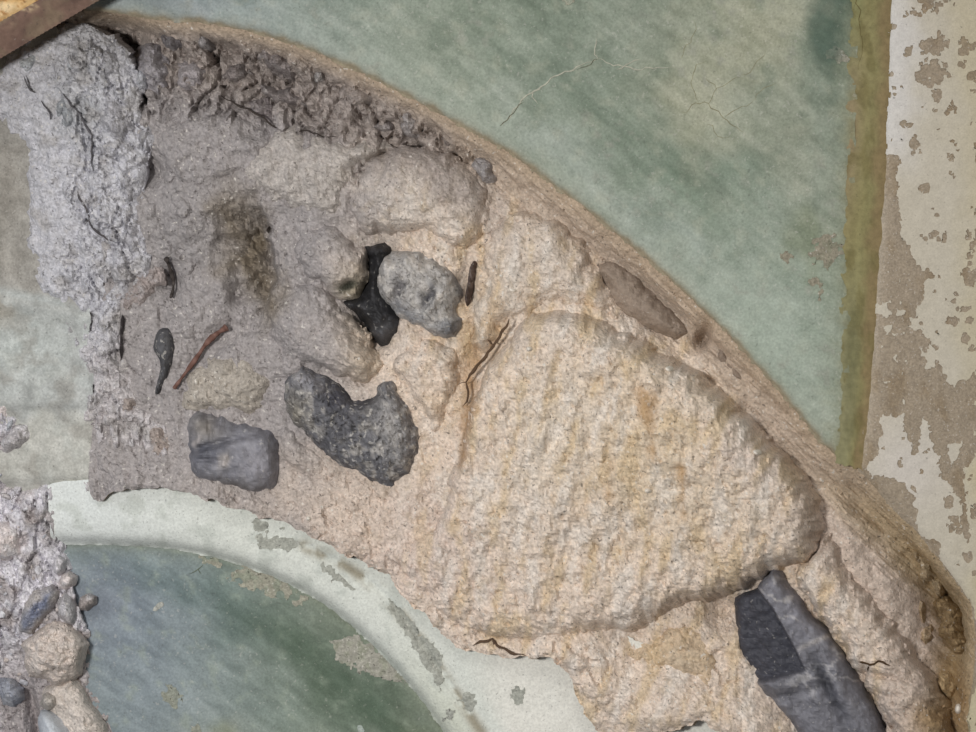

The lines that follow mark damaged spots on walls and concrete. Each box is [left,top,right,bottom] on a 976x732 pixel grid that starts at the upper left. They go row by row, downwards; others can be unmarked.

spalling [257,50,296,83]
spalling [259,84,300,106]
peeling [875,0,976,388]
spalling [0,23,170,457]
spalling [599,261,688,340]
crack [458,319,509,406]
peeling [251,518,303,552]
peeling [867,413,976,619]
peeling [329,634,406,684]
peeling [387,598,445,691]
spalling [783,564,825,625]
spalling [933,595,966,655]